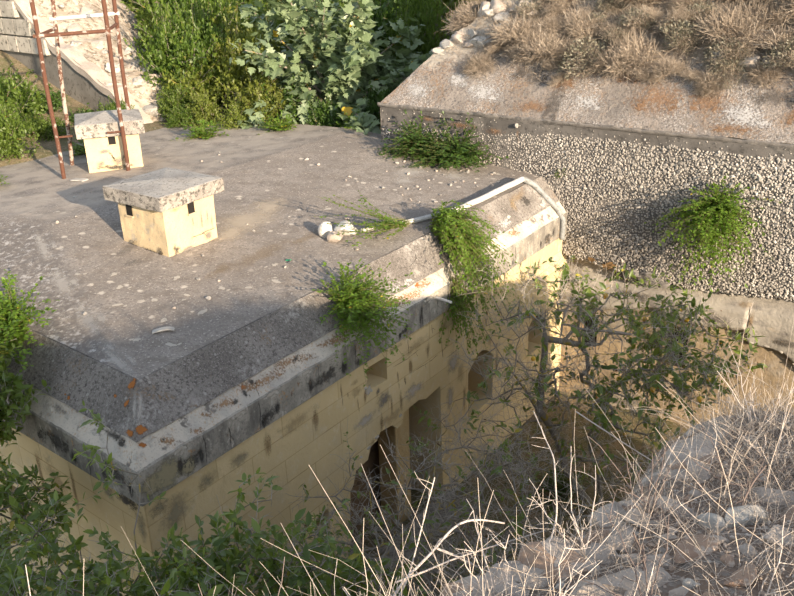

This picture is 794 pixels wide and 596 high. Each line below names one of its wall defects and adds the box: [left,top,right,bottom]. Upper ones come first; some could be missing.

damp [309,359,360,391]
damp [262,404,280,428]
damp [38,429,76,461]